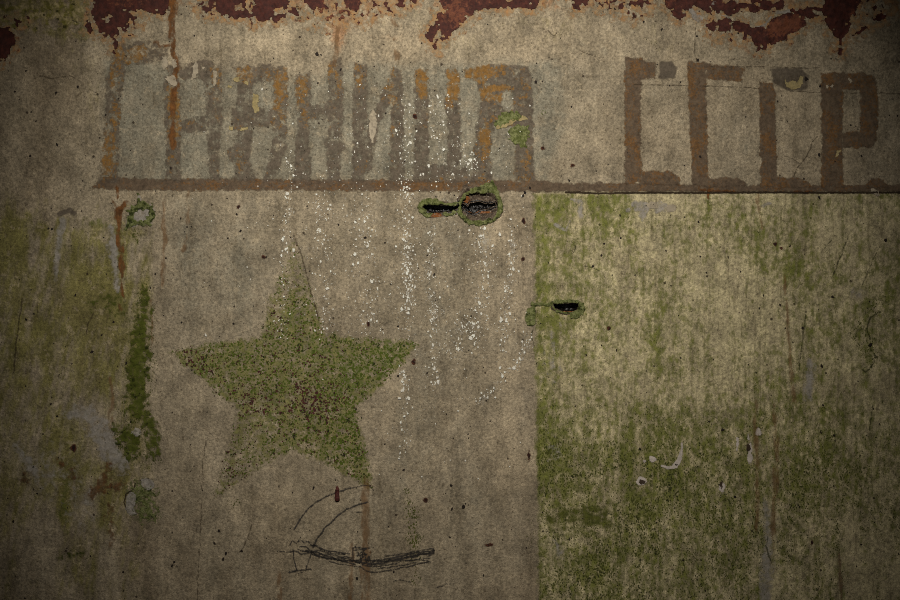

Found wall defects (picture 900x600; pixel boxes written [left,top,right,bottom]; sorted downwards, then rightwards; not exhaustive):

corrosion [153,0,179,150]
peeling [75,0,547,58]
peeling [566,0,900,68]
water stain [395,94,478,186]
corrosion [113,186,126,309]
water stain [273,150,298,339]
water stain [307,191,335,340]
water stain [351,205,376,272]
spalling [413,171,504,240]
water stain [397,173,533,404]
spalling [525,288,596,326]